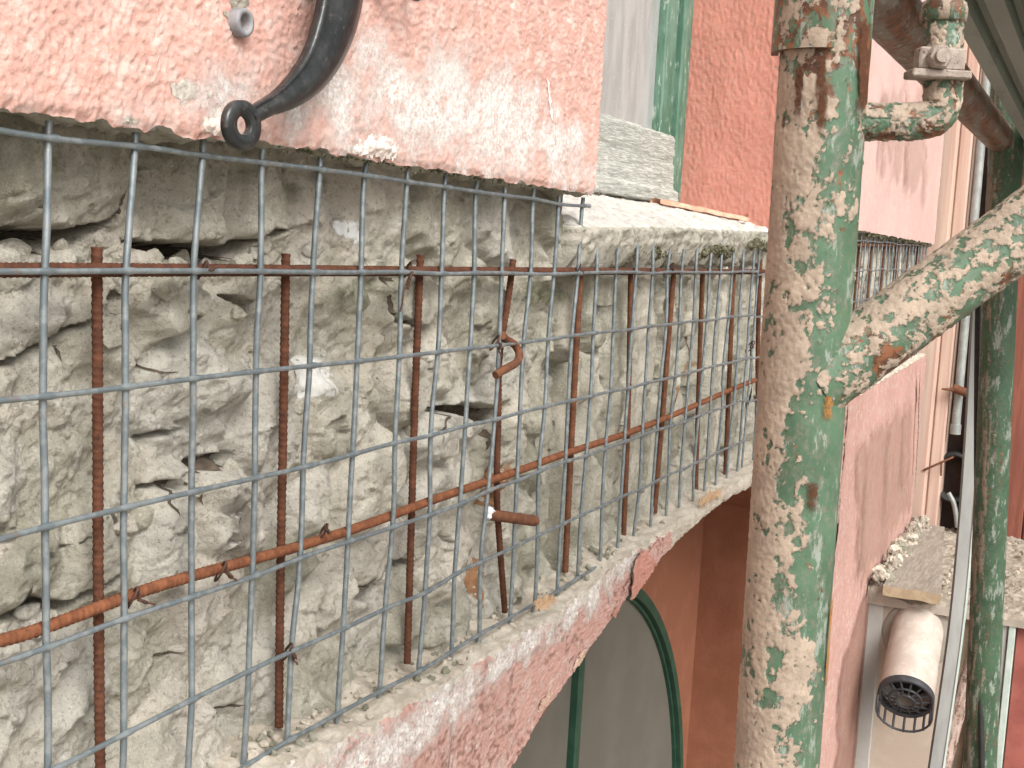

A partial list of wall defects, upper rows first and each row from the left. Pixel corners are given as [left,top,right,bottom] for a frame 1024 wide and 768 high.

corrosion [795,57,828,127]
corrosion [857,24,869,110]
crack [111,192,126,216]
crack [0,230,42,255]
crack [131,243,231,262]
spalling [852,233,923,311]
spalling [0,112,767,768]
corrosion [474,463,511,508]
corrosion [463,549,484,608]